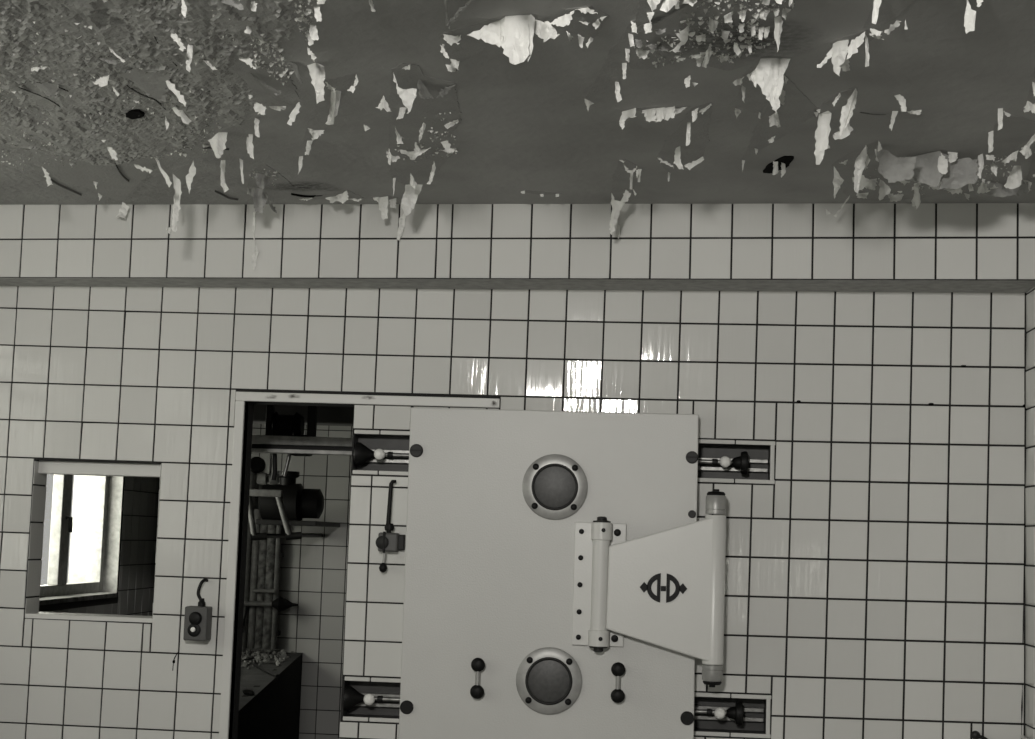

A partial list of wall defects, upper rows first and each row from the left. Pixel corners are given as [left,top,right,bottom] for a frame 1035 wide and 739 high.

peeling [0,0,359,234]
peeling [298,0,610,240]
peeling [609,159,643,239]
peeling [584,0,1035,217]